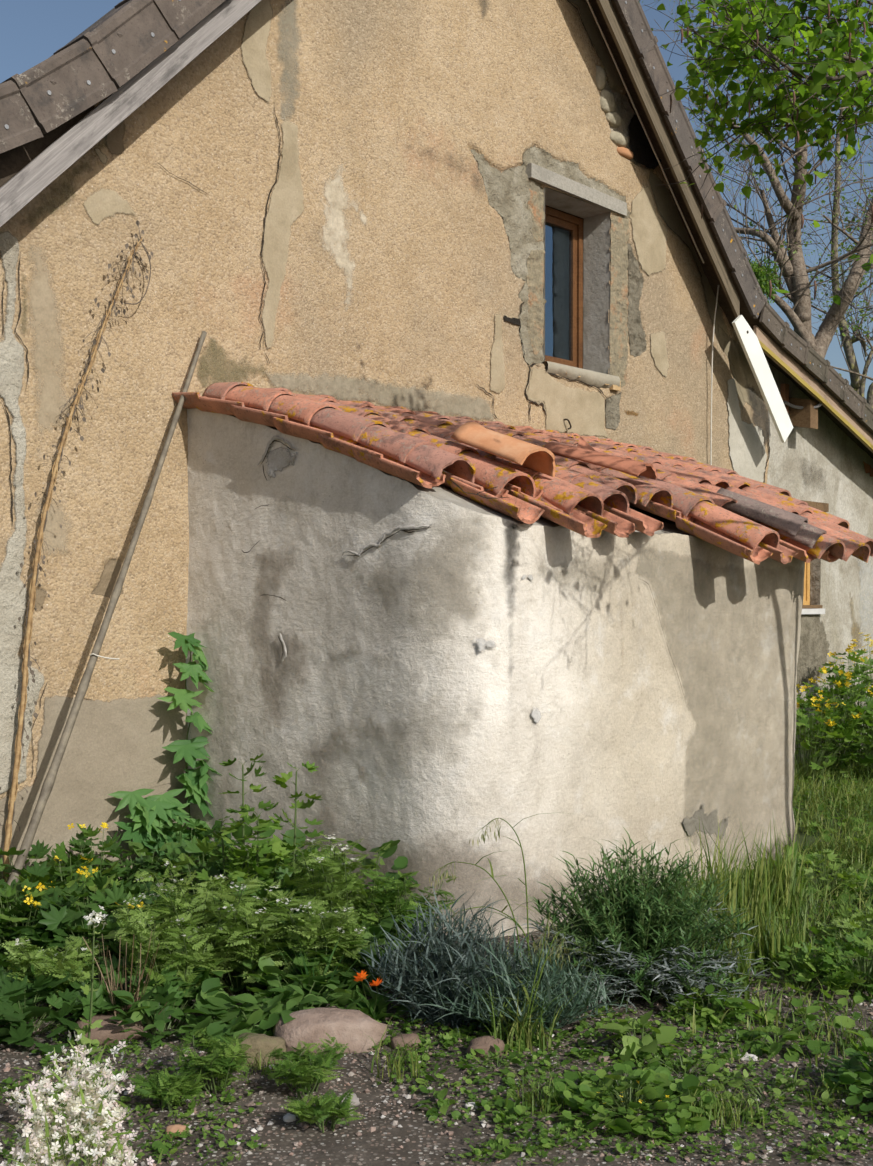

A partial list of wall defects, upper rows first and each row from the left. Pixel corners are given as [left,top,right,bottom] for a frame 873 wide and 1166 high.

spalling [471,146,647,430]